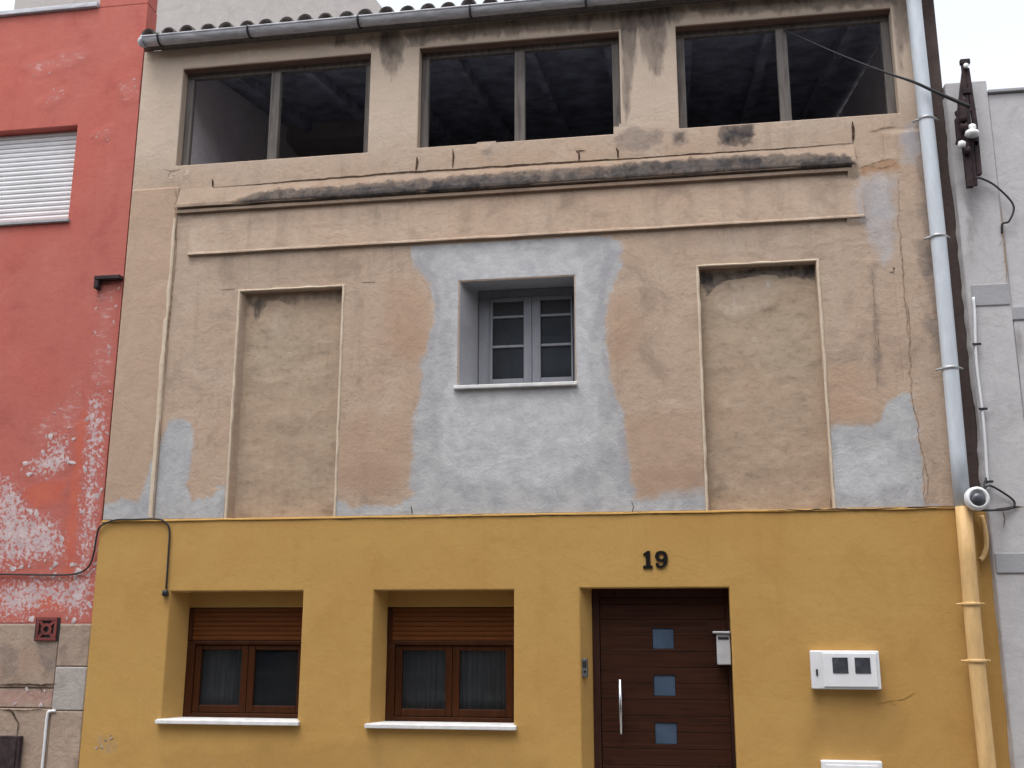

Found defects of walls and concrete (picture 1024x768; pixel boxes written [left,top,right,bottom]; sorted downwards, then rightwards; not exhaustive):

peeling [0,281,123,623]
damp [202,0,912,378]
crack [770,159,954,511]